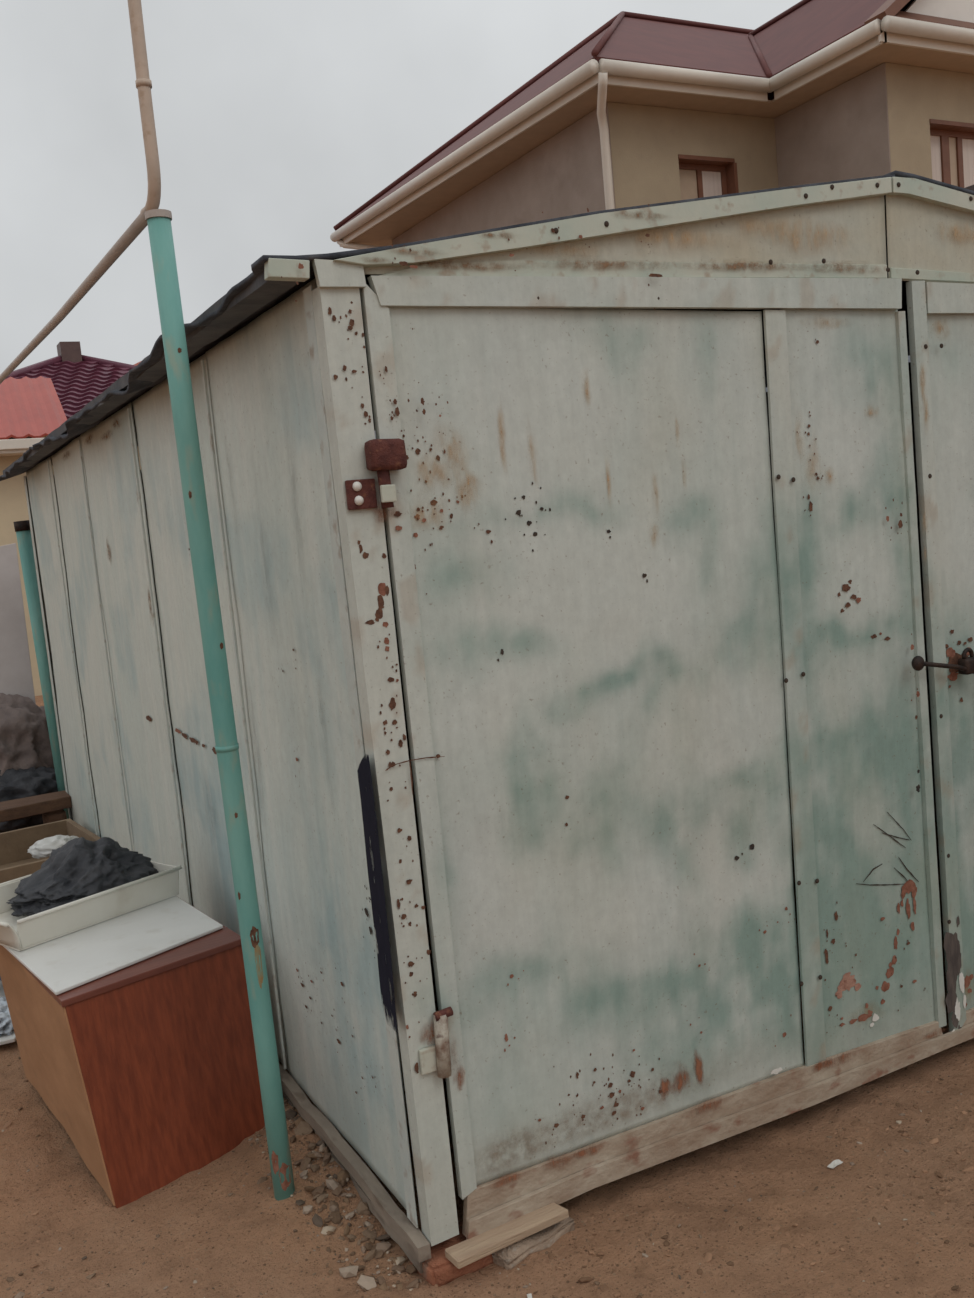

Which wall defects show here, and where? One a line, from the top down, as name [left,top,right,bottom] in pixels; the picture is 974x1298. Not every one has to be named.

rust [365,583,389,627]
rust [175,728,217,754]
rust [880,879,917,931]
peeling [824,902,917,1033]
peeling [944,916,966,1032]
rust [840,1003,873,1027]
rust [661,1057,703,1094]